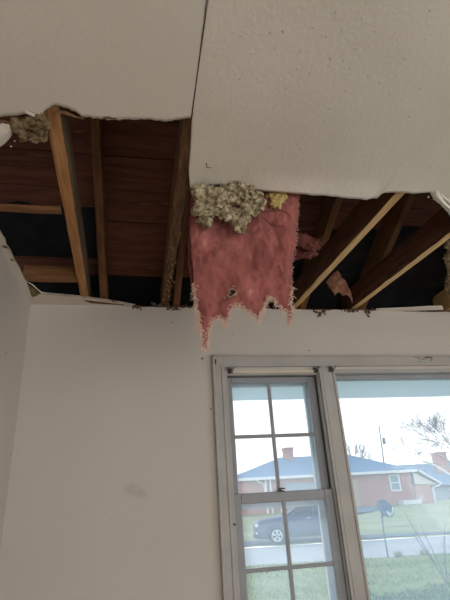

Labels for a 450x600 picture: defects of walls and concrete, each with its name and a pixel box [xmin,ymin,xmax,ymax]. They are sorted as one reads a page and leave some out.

crack [191,0,210,118]
peeling [0,120,12,147]
peeling [427,190,450,211]